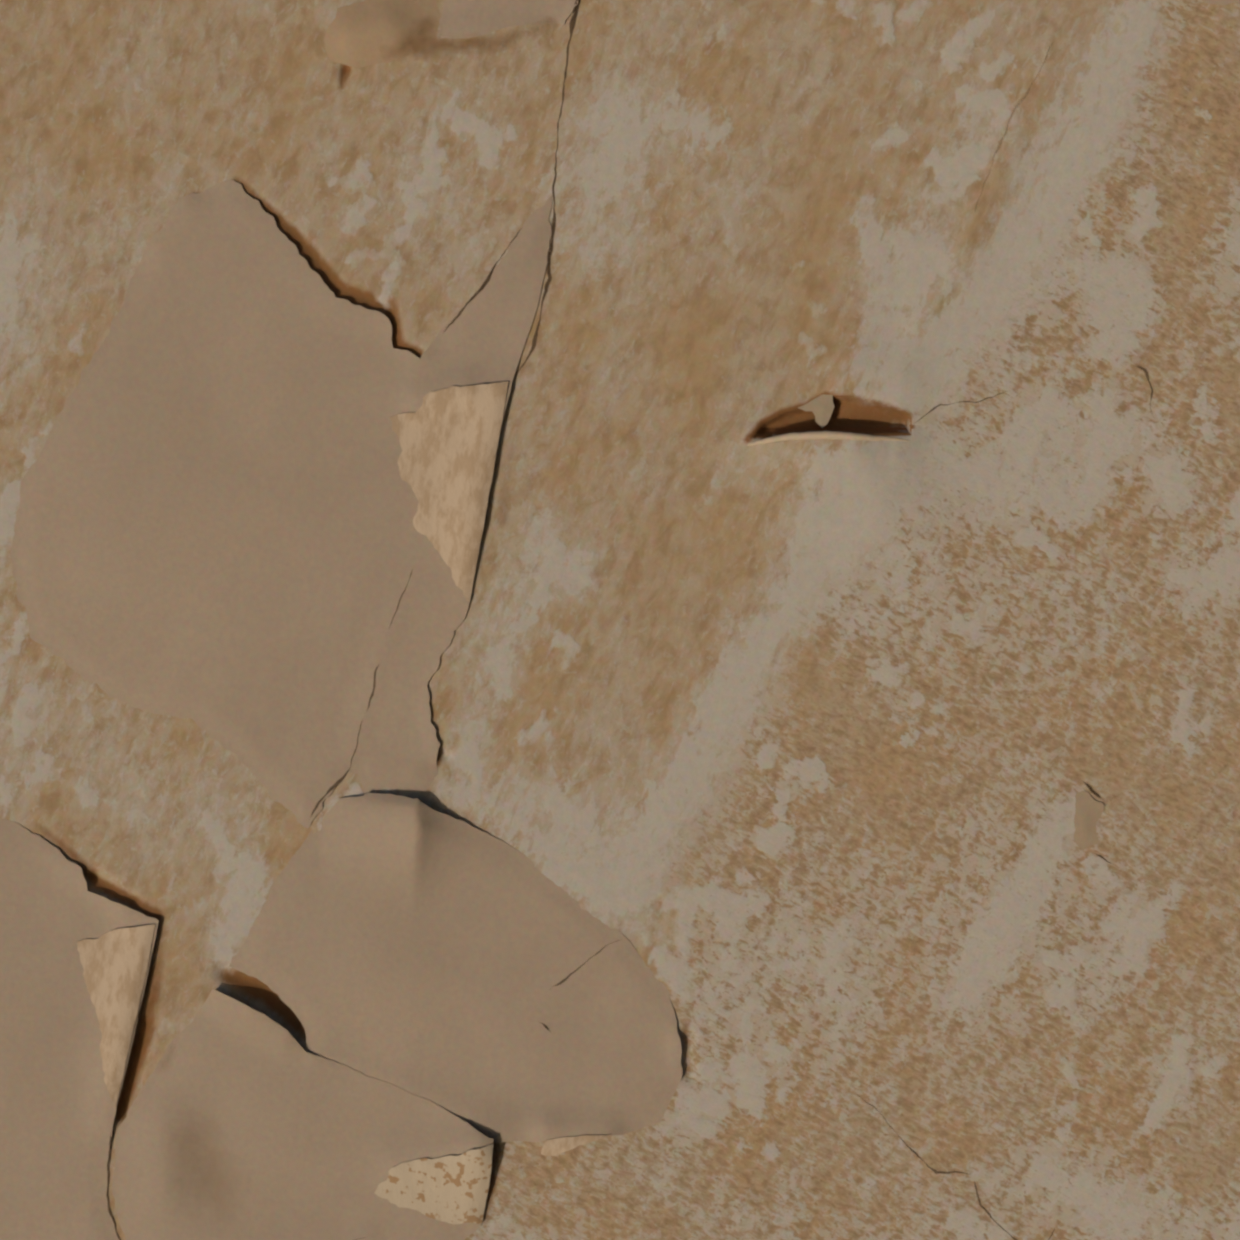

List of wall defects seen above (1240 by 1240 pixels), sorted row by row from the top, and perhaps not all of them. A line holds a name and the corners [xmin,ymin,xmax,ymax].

crack [444,229,521,332]
peeling [437,0,578,39]
crack [517,0,580,373]
peeling [0,70,793,1240]
peeling [600,0,1204,945]
crack [858,1095,1017,1240]